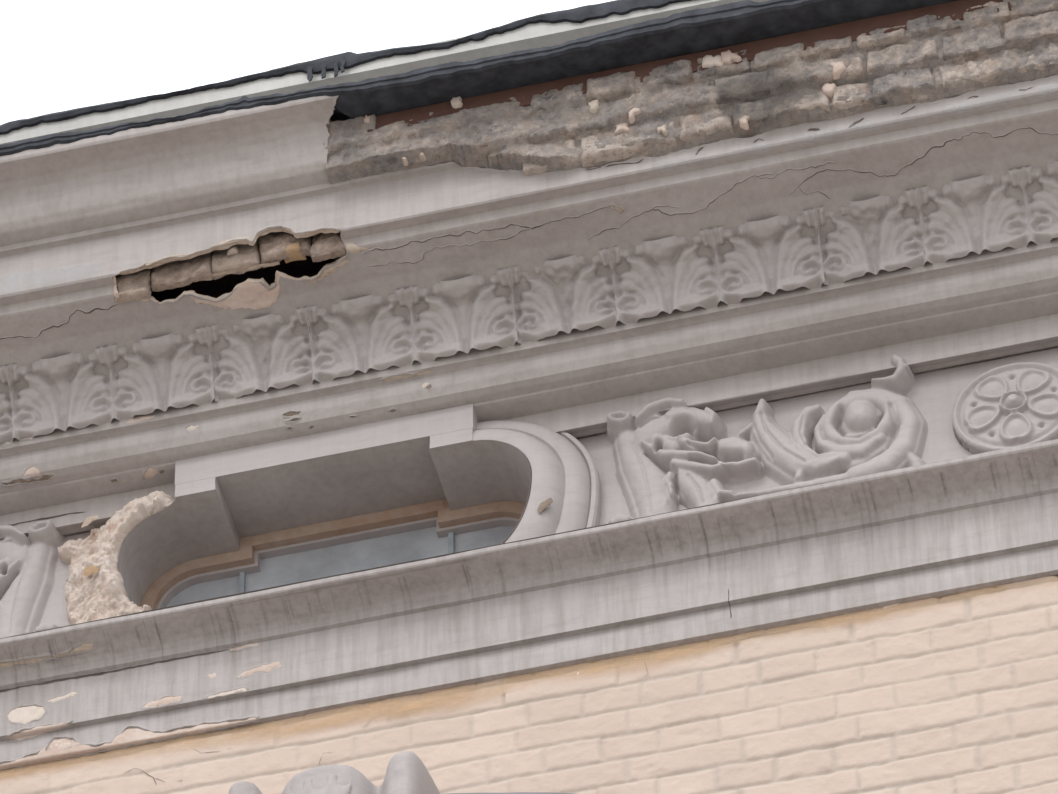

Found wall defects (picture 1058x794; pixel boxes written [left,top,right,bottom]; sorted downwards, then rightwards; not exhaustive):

flaking render [323,0,1058,184]
crack [361,126,1058,267]
spalling [110,225,370,310]
crack [0,303,119,340]
peeling [0,465,57,488]
spalling [57,465,174,625]
peeling [201,659,285,700]
peeling [0,690,261,771]